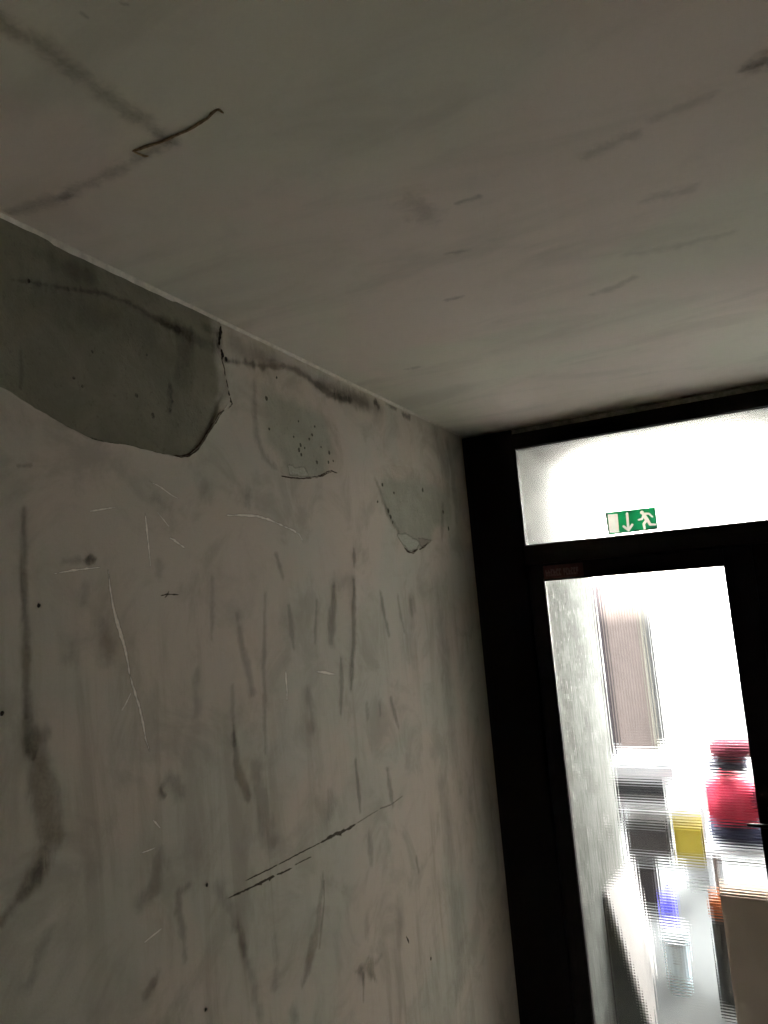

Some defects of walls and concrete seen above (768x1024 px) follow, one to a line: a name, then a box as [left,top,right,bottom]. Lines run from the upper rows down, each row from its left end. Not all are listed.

crack [132,108,224,158]
flaking render [0,218,230,459]
flaking render [370,464,456,554]